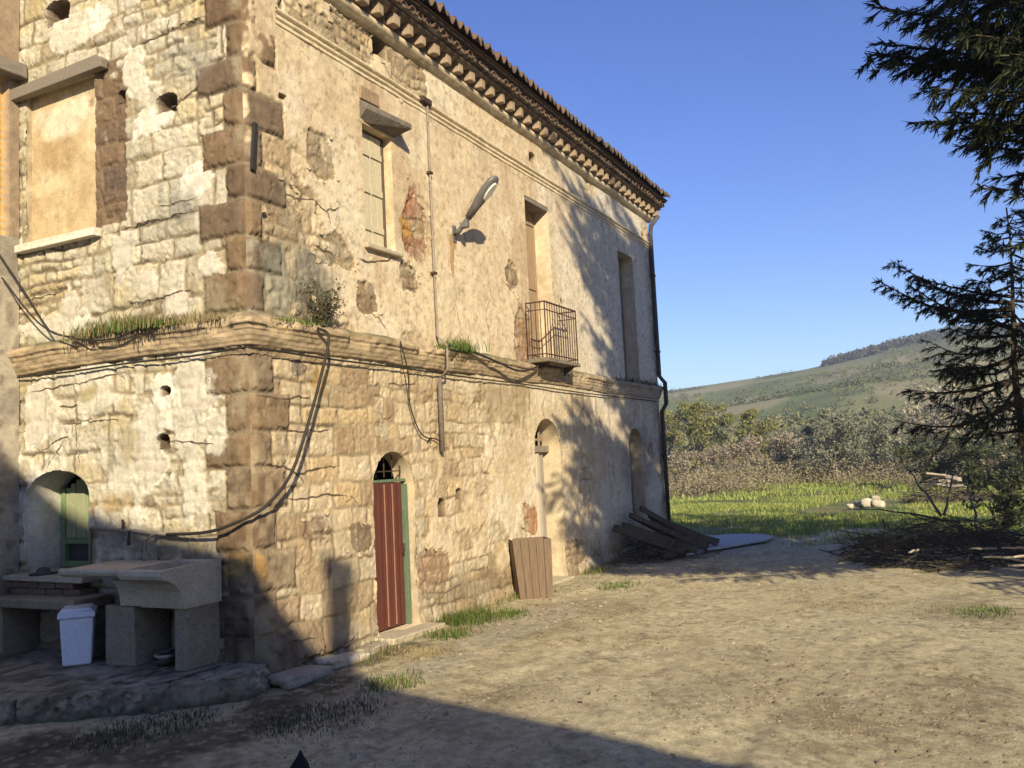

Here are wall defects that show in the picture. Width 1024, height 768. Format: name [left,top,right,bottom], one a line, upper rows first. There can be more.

crack [279,189,339,222]
peeling [254,174,379,321]
peeling [306,129,340,183]
peeling [400,175,432,293]
peeling [505,259,531,362]
peeling [522,500,538,535]